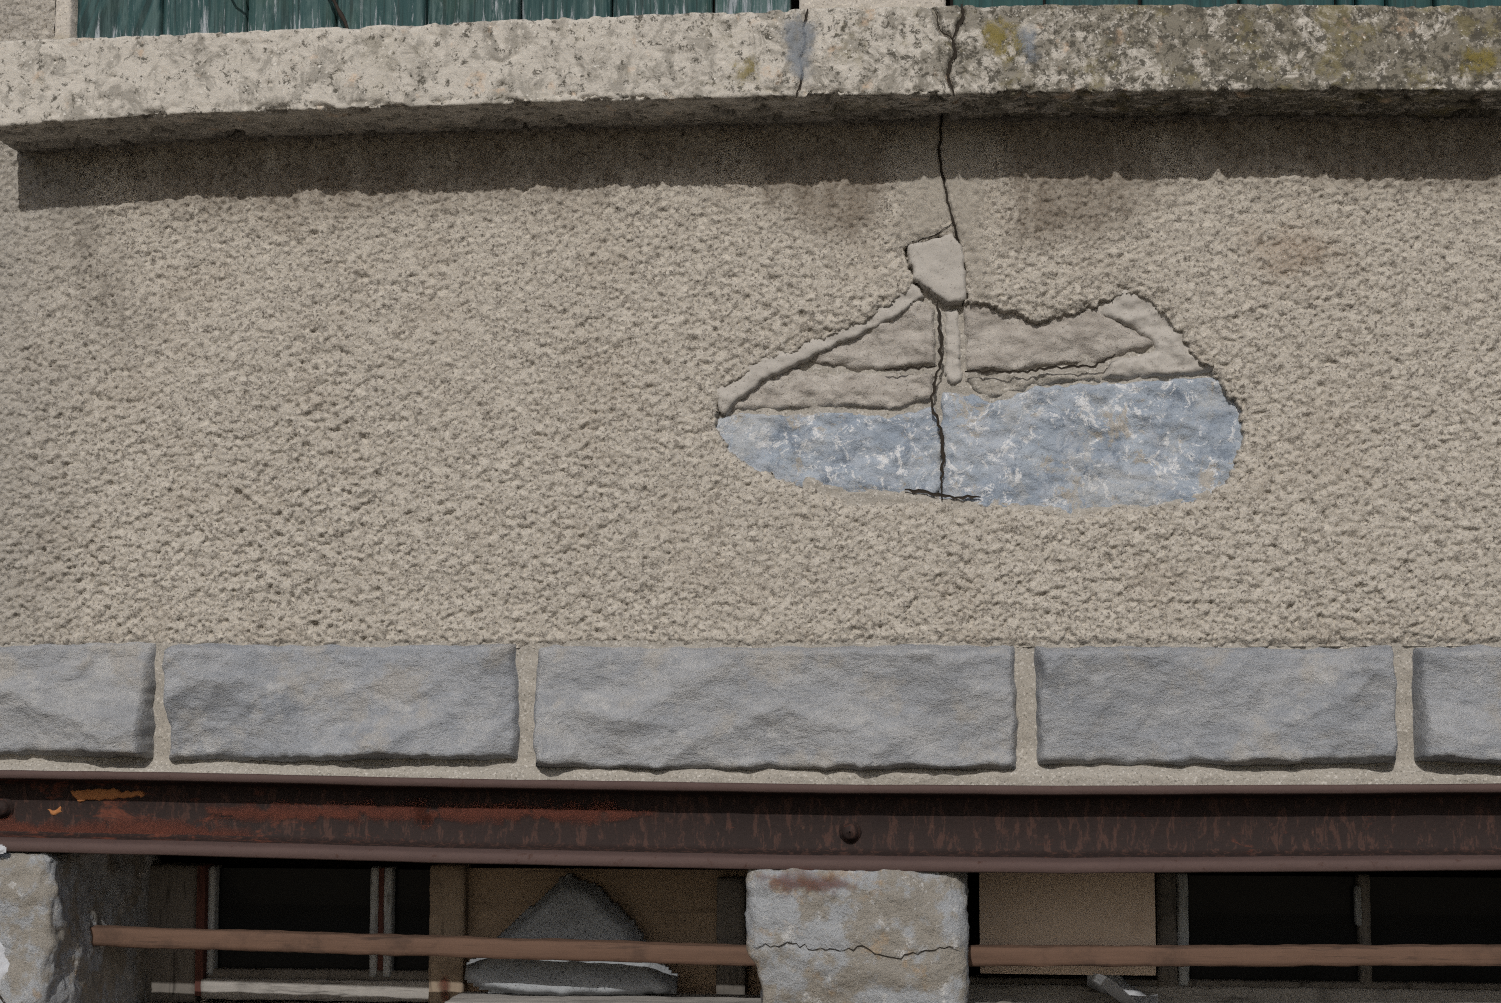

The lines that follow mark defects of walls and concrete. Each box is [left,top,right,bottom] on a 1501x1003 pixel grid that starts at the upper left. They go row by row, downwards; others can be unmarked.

crack [796,9,808,98]
crack [905,4,965,251]
flaking render [716,251,1243,519]
flaking render [0,943,10,984]
crack [753,942,959,959]